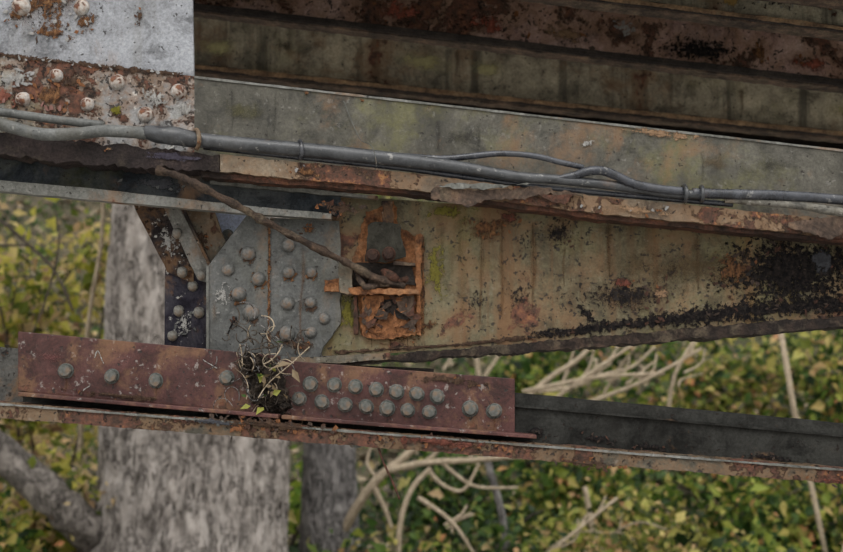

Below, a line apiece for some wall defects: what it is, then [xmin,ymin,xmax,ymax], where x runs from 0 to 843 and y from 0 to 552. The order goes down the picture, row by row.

rust [2,0,98,47]
rust [647,33,777,67]
rust [0,52,183,91]
rust [333,216,843,355]
rust [631,442,672,452]
rust [741,452,809,463]